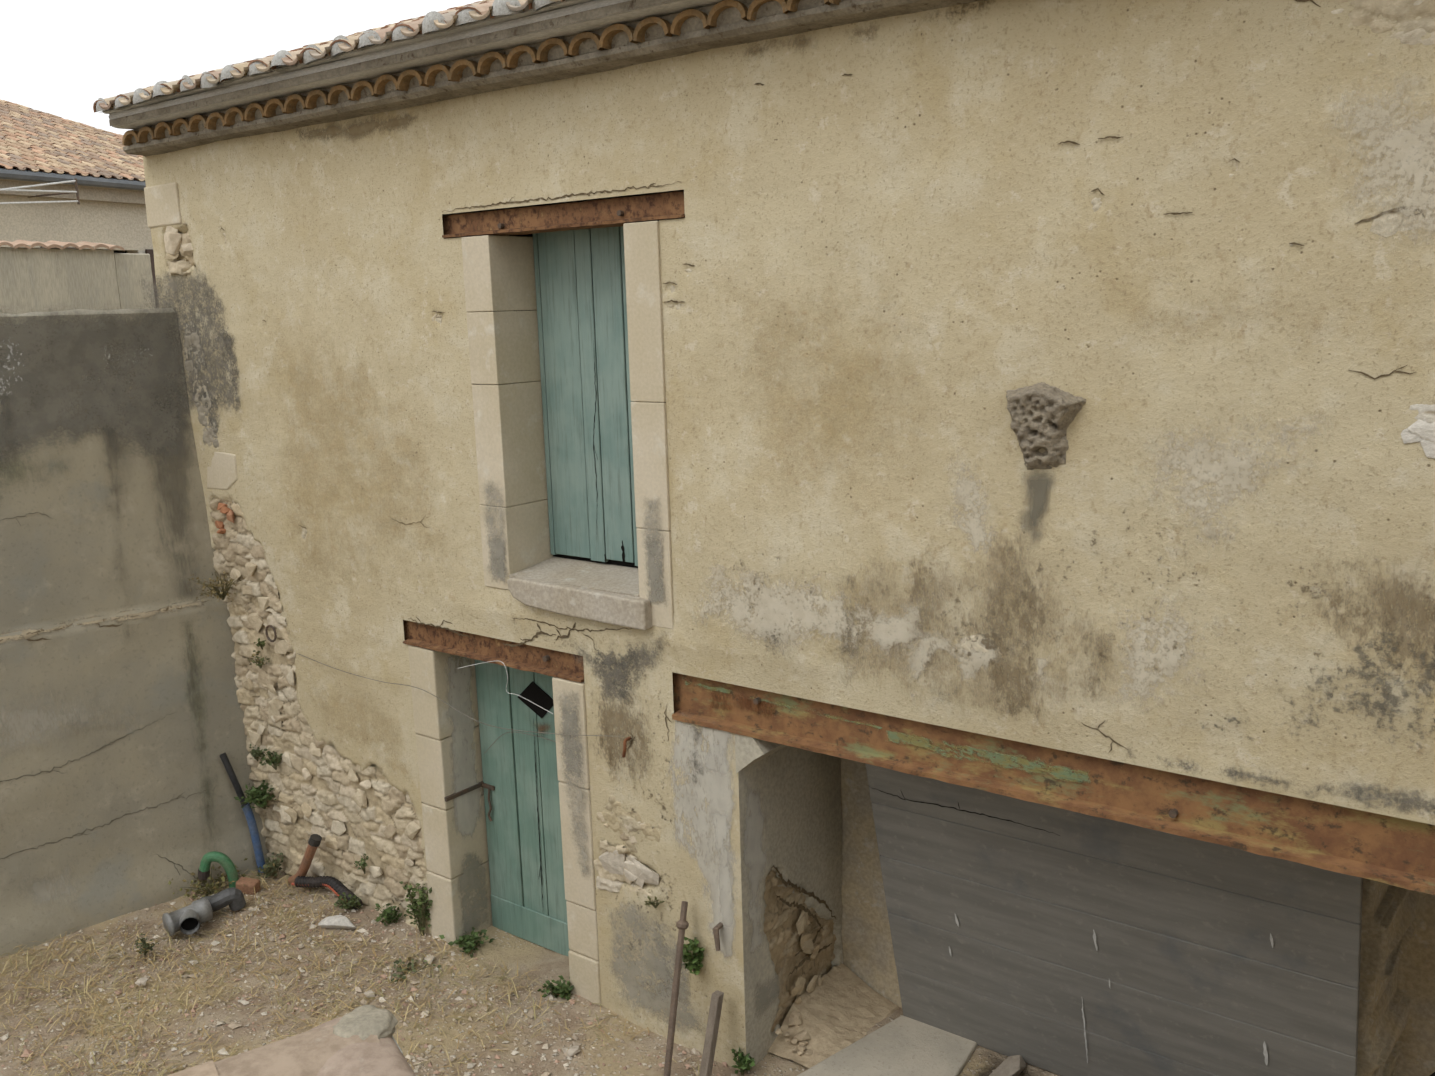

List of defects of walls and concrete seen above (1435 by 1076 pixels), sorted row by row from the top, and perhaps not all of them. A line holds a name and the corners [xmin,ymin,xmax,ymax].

peeling [1331,0,1435,56]
flaking render [1401,404,1435,459]
damp [842,475,1157,715]
crack [409,617,632,650]
damp [1275,567,1435,742]
flaking render [209,498,428,920]
crack [0,712,175,782]
crack [0,785,218,859]
crack [155,854,204,885]
flaking render [593,795,662,896]
flaking render [763,865,837,1032]